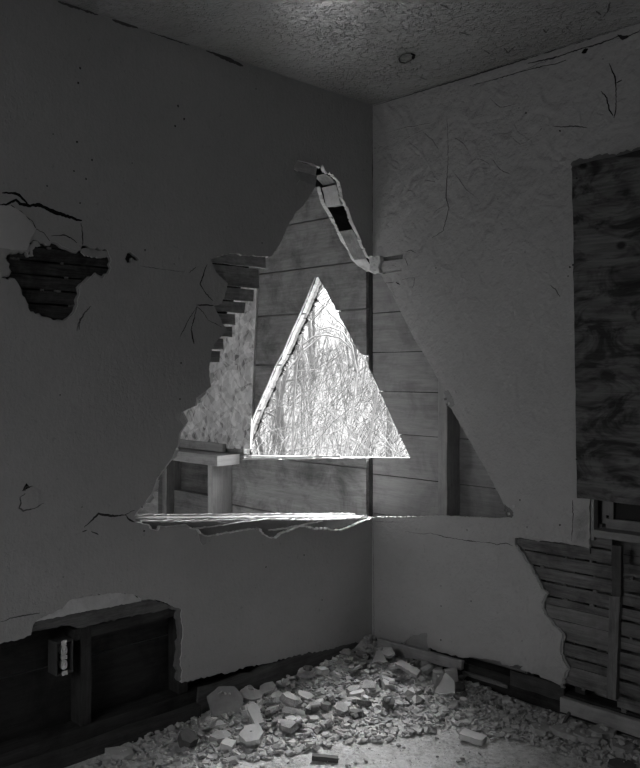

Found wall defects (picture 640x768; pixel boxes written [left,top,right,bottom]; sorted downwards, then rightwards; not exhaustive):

crack [372,25,634,256]
crack [0,192,83,245]
flaking render [2,240,111,329]
crack [143,265,221,343]
flaking render [210,254,266,362]
crack [83,510,134,535]
spalling [167,605,182,681]